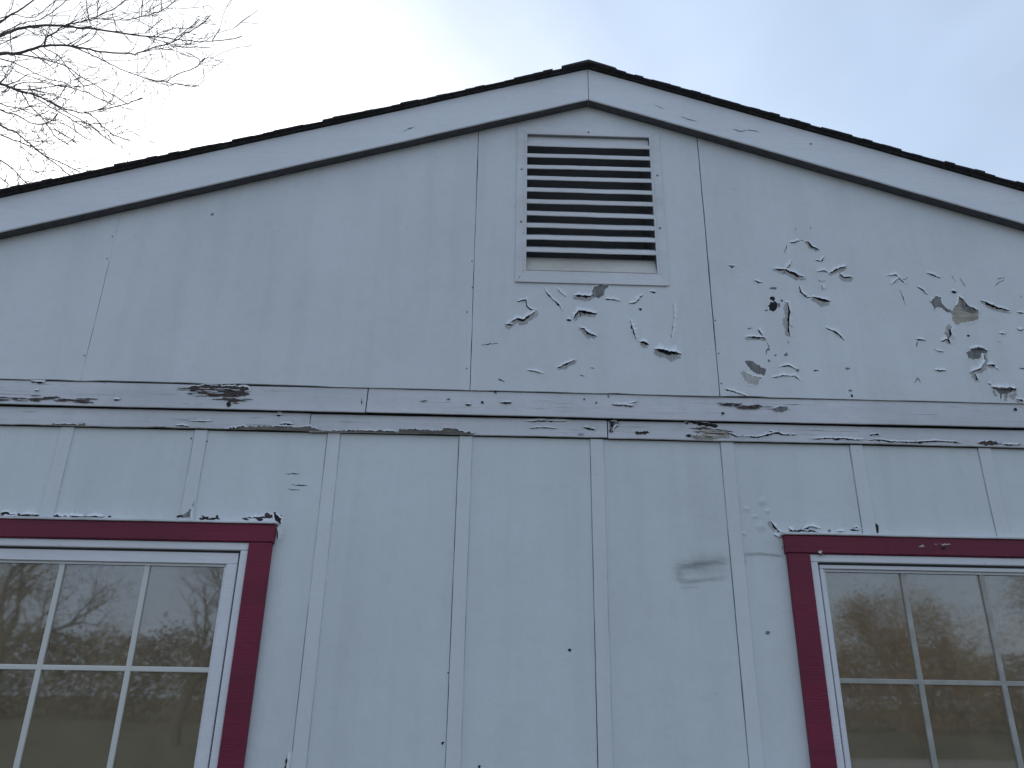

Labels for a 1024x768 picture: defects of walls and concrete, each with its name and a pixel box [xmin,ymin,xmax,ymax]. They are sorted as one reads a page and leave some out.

peeling [572,284,611,302]
peeling [929,287,981,326]
peeling [740,360,766,387]
peeling [966,343,1018,411]
peeling [0,379,97,403]
peeling [177,384,253,407]
peeling [225,424,475,434]
peeling [684,403,788,439]
peeling [0,508,40,517]
peeling [53,508,111,518]
peeling [176,500,219,520]
peeling [242,510,286,541]